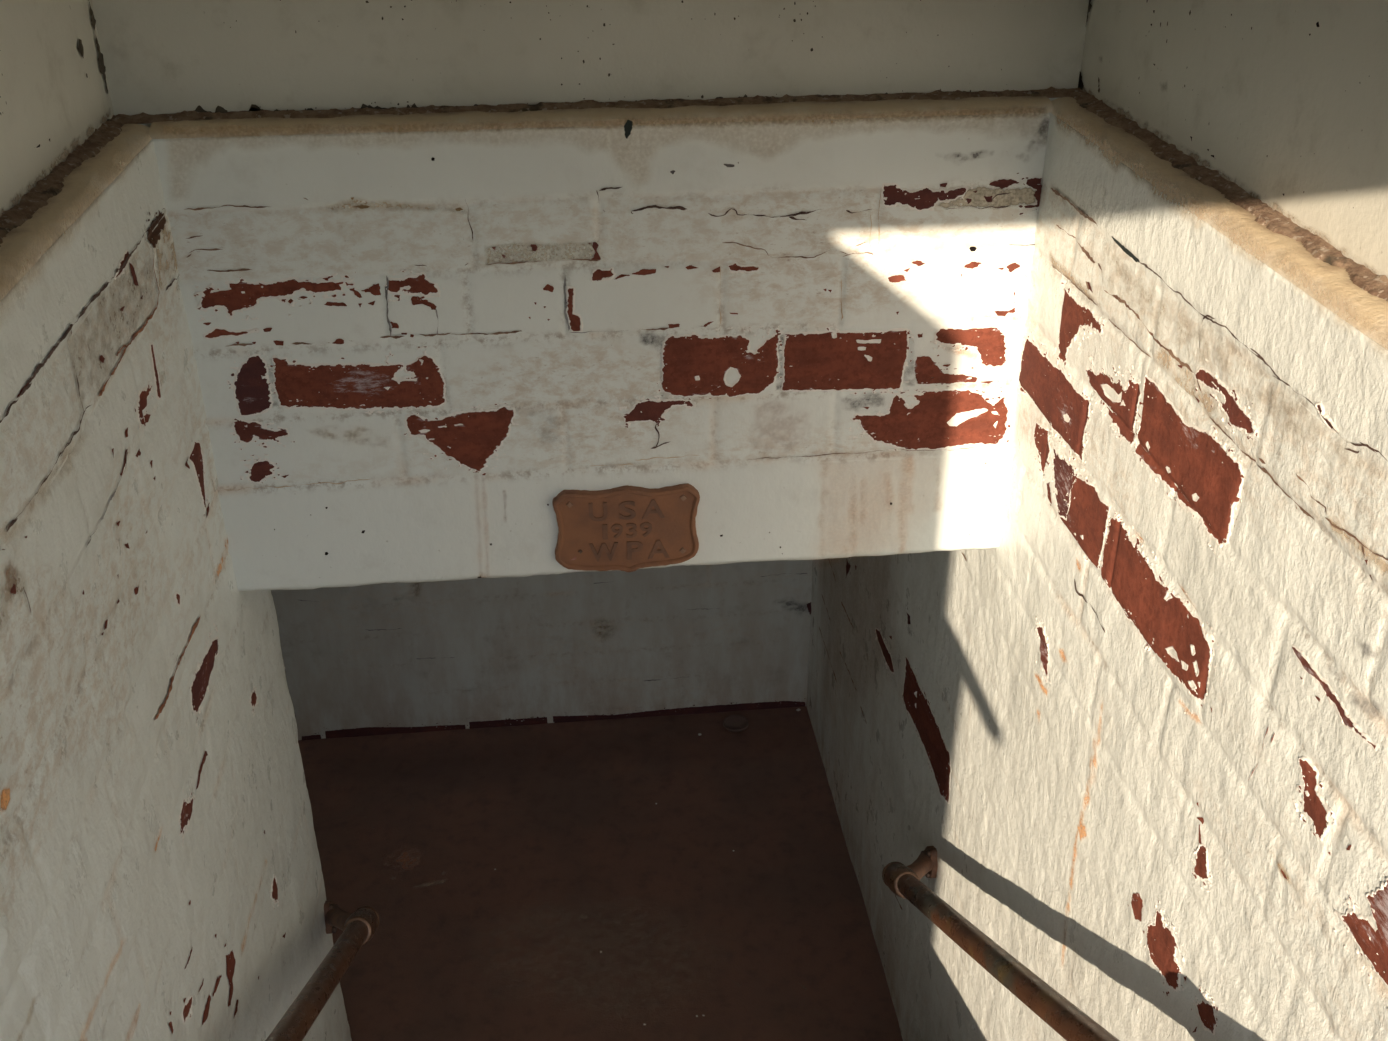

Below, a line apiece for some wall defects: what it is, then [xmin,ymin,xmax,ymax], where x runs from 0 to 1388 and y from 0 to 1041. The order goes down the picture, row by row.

crack [0,205,268,531]
peeling [145,208,519,484]
crack [380,265,520,339]
peeling [572,242,669,282]
peeling [879,173,1042,215]
crack [1010,188,1388,561]
peeling [618,259,1259,714]
peeling [189,623,222,727]
peeling [875,626,952,804]
peeling [1292,756,1351,855]
peeling [1131,893,1220,1035]
peeling [1334,857,1388,986]